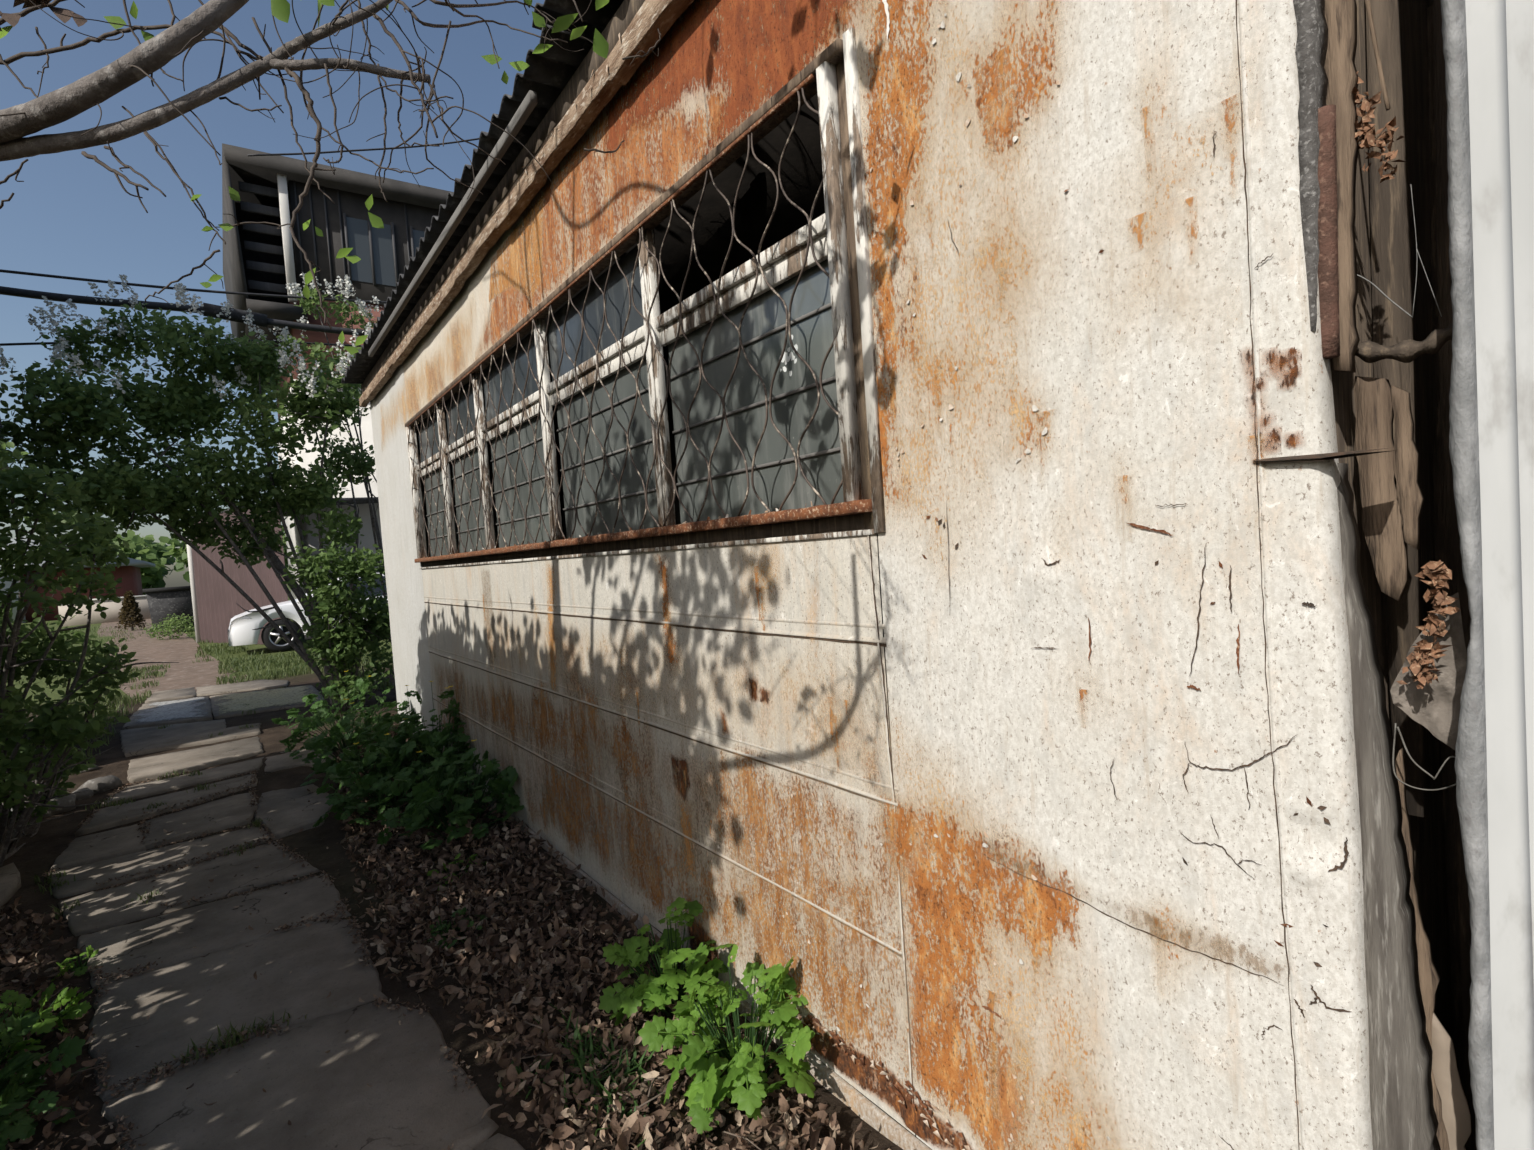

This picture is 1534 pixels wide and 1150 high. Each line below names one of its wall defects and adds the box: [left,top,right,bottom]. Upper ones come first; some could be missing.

corrosion [381,0,1066,561]
corrosion [742,544,779,631]
corrosion [435,554,1120,1150]
corrosion [1154,907,1195,973]